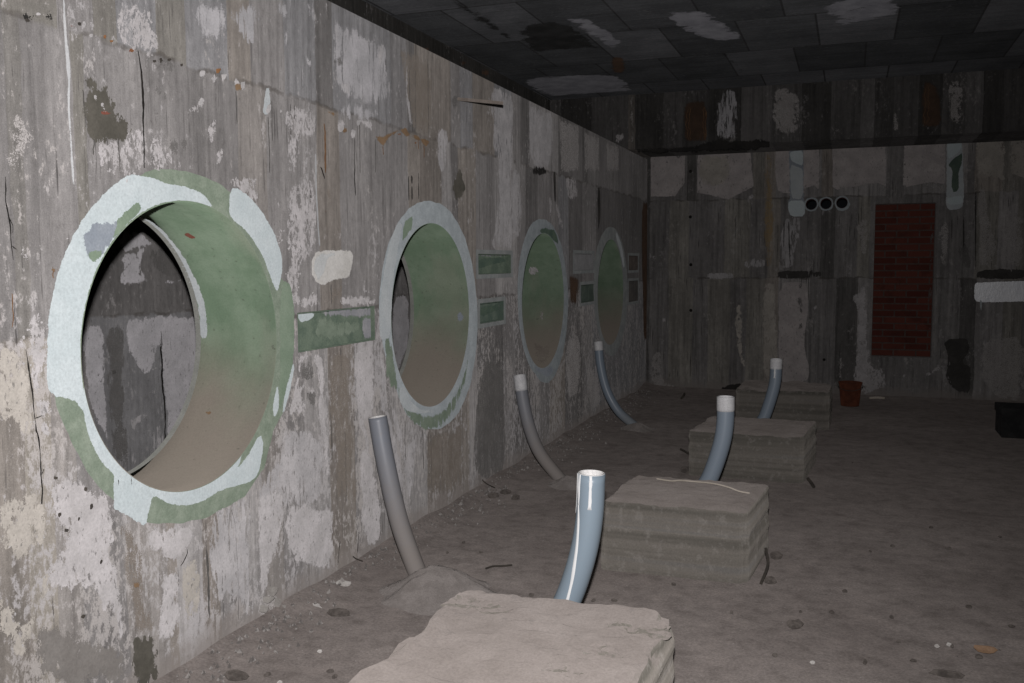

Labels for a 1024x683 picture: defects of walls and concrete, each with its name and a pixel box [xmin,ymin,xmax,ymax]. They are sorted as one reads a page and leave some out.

water stain [82,77,132,170]
crack [137,51,145,168]
peeling [333,21,391,173]
peeling [437,129,448,171]
peeling [716,90,737,139]
peeling [772,89,799,134]
crack [25,349,44,517]
crack [159,333,167,438]